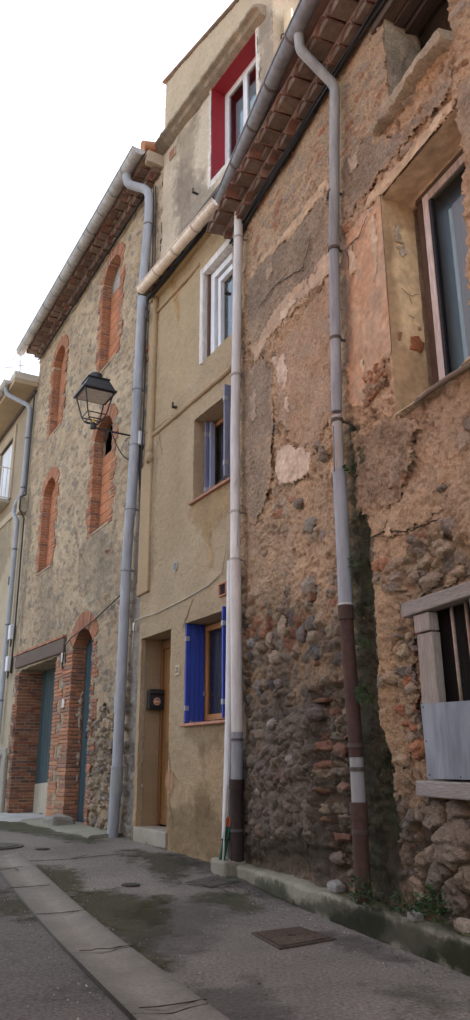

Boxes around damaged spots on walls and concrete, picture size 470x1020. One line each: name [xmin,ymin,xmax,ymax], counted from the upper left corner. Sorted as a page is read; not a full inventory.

crack [259,238,311,308]
peeling [341,70,470,409]
peeling [240,179,331,526]
flaking render [293,498,317,535]
flaking render [246,614,307,689]
water stain [254,877,293,904]
spalling [397,799,470,914]
water stain [420,938,470,975]